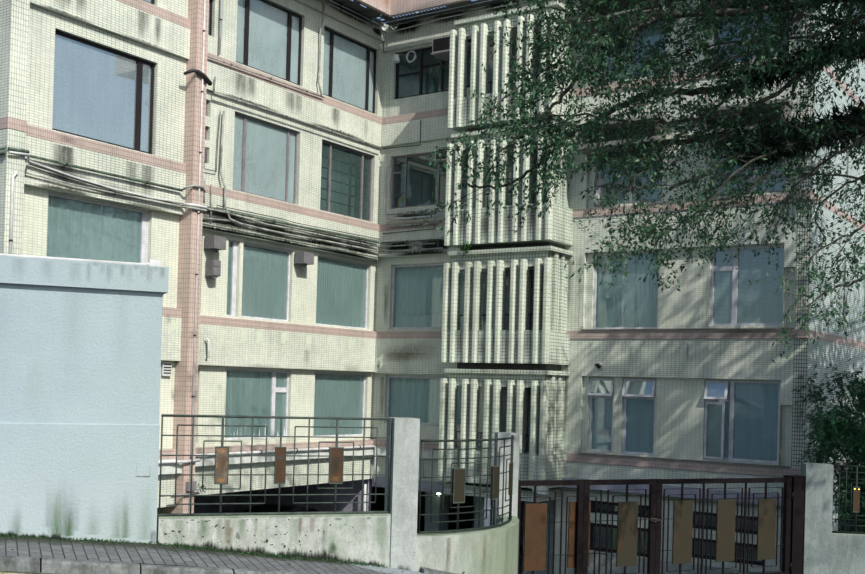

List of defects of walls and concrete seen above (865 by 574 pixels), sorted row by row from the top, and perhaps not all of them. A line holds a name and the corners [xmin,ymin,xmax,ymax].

damp [0,519,70,539]